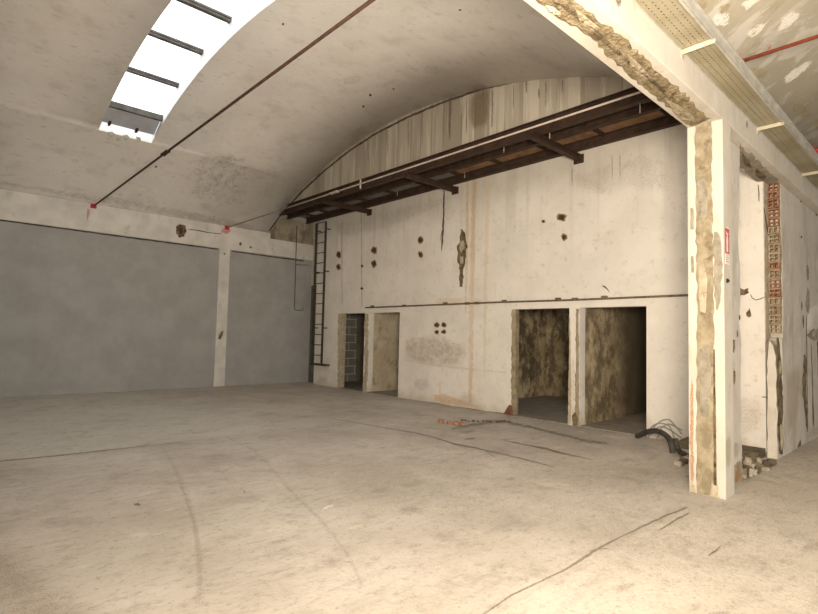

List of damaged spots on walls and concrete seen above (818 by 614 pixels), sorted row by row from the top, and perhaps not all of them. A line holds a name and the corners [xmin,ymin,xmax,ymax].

peeling [777,10,800,31]
peeling [783,60,811,83]
flaking render [457,229,468,287]
spalling [536,0,743,498]
spalling [739,143,808,454]
flaking render [461,310,517,416]
crack [332,418,592,467]
crack [484,507,688,614]